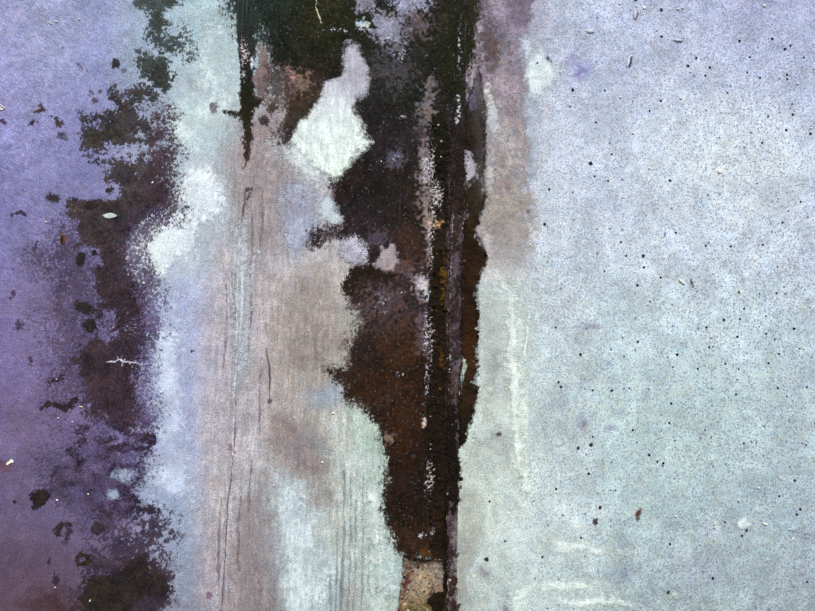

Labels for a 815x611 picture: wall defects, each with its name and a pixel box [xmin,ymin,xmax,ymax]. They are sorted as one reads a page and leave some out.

water stain [13,0,199,611]
peeling [259,472,348,611]
water stain [209,0,539,611]
peeling [305,381,449,611]